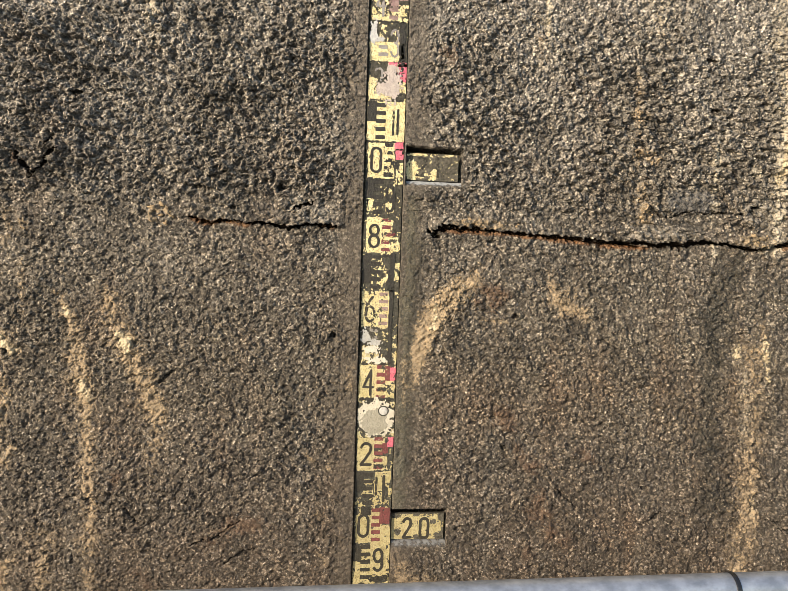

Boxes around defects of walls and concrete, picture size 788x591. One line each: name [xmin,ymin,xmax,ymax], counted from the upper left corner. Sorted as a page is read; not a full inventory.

crack [13,132,57,178]
crack [189,201,337,231]
crack [427,223,788,253]
crack [654,204,765,219]
leakage [0,330,22,357]
leakage [99,289,167,464]
leakage [0,370,16,464]
leakage [59,299,98,590]
leakage [0,554,18,591]
leakage [26,529,56,591]